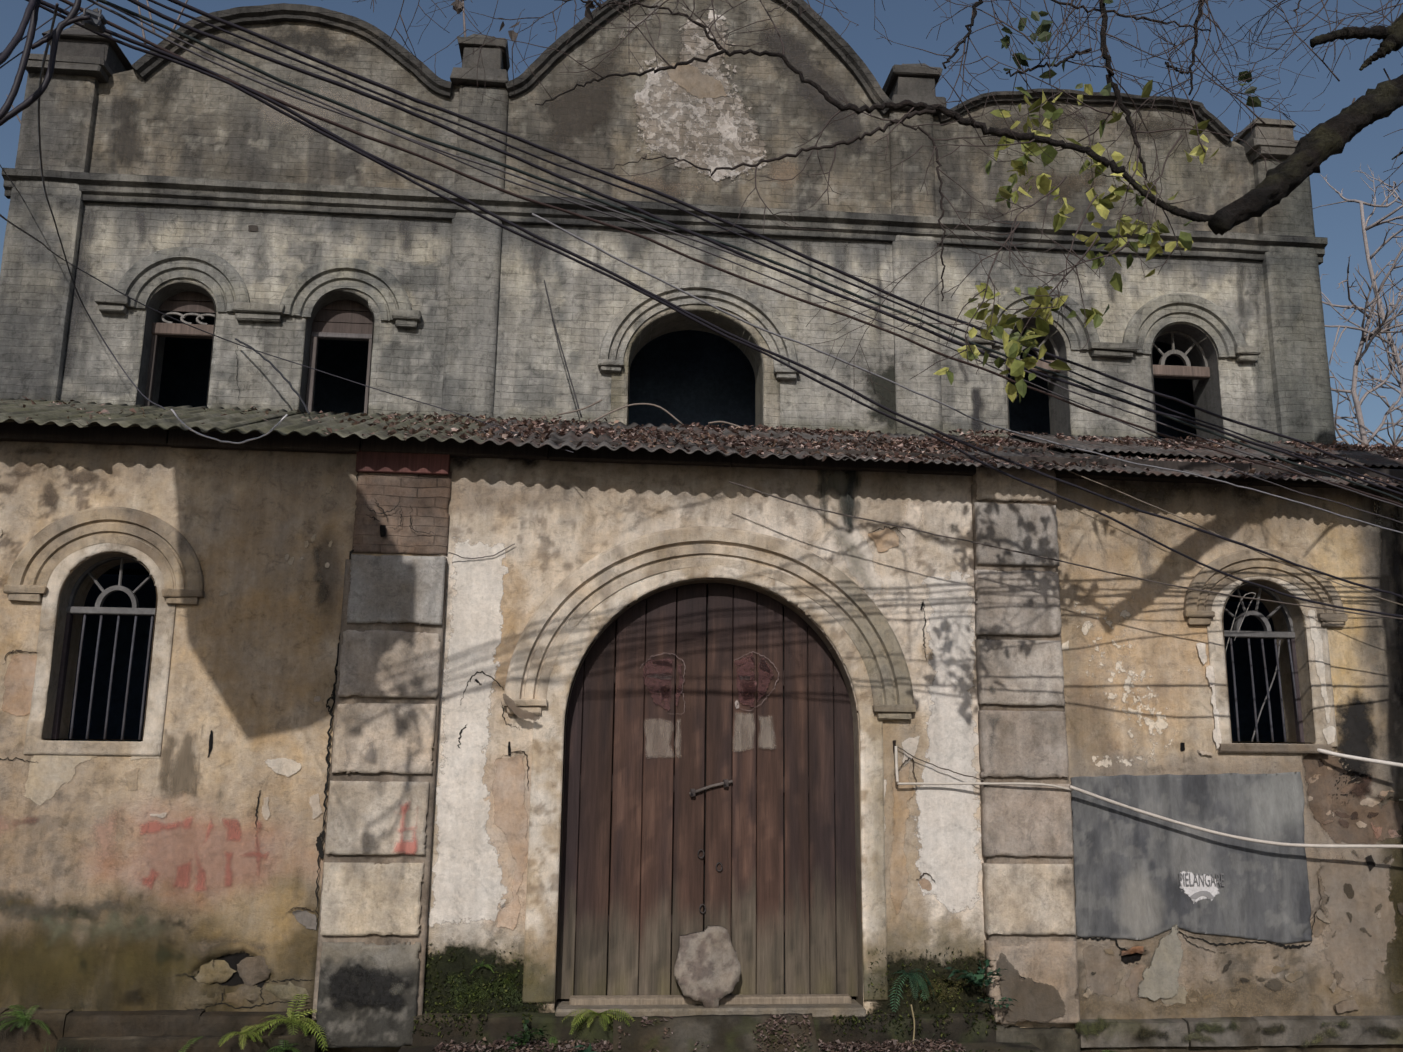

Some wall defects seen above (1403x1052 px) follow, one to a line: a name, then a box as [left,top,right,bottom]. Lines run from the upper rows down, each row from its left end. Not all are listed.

spalling [633,9,769,183]
spalling [1,650,37,716]
crack [315,634,340,931]
peeling [428,537,530,930]
water stain [820,470,869,584]
peeling [837,503,922,600]
peeling [884,570,982,914]
peeling [1062,598,1222,768]
spalling [1302,610,1403,1013]
water stain [1374,500,1403,701]